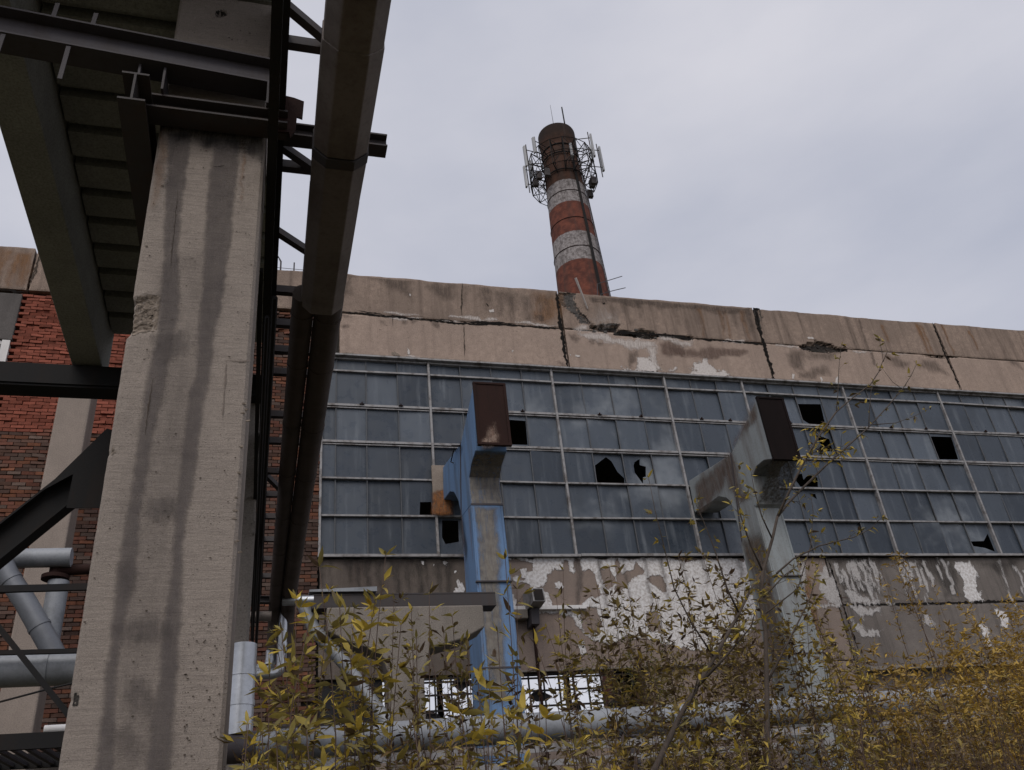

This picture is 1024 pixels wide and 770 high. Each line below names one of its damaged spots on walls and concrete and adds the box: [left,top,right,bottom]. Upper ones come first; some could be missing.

spalling [132,295,161,335]
crack [342,284,790,379]
spalling [558,292,693,341]
spalling [800,341,848,353]
crack [932,323,1024,390]
water stain [99,126,263,770]
peeling [508,557,756,655]
peeling [799,558,895,638]
peeling [894,557,984,628]
peeling [978,559,1024,646]